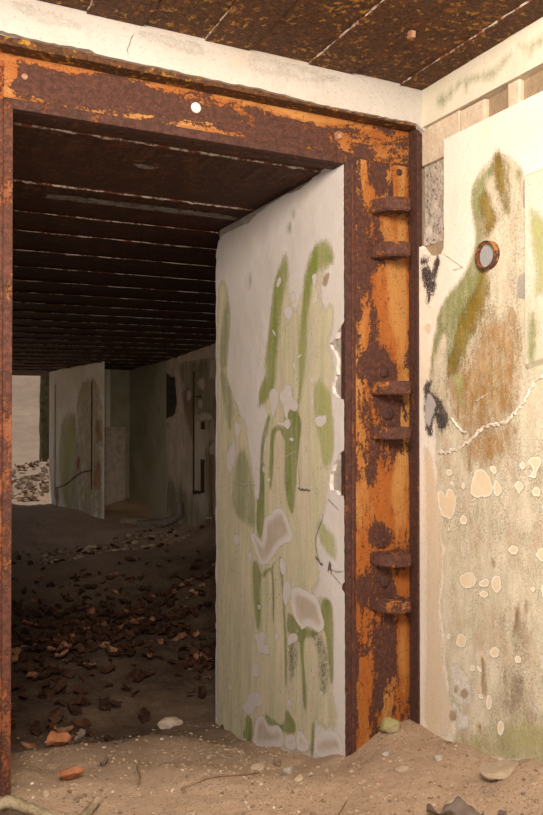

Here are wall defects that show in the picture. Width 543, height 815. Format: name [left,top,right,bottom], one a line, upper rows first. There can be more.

spalling [424,159,444,246]
peeling [270,384,298,441]
rust [446,308,522,472]
crack [438,374,543,455]
rust [205,442,213,516]
leakage [217,242,337,752]
spalling [333,459,341,493]
peeling [437,465,502,532]
leakage [420,156,543,763]
peeling [514,456,543,510]
peeling [248,507,324,678]
peeling [241,691,342,757]